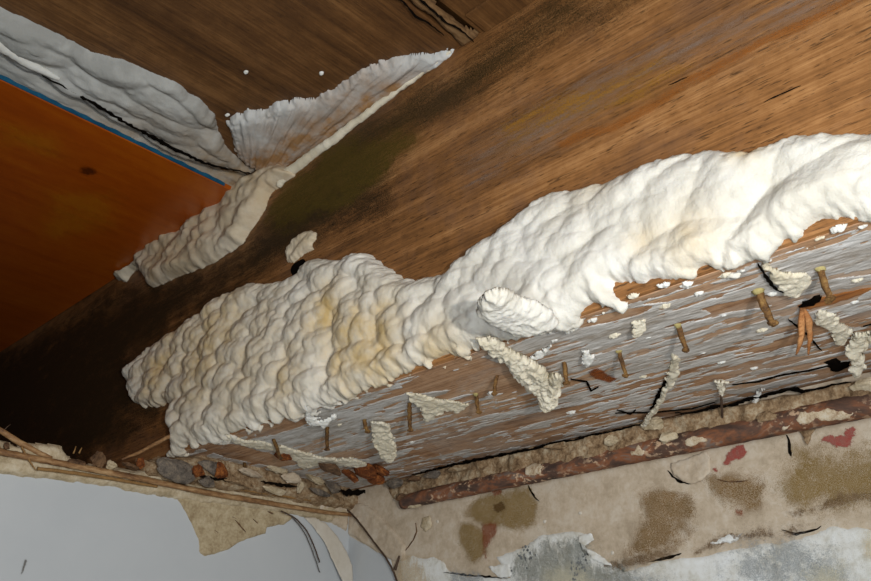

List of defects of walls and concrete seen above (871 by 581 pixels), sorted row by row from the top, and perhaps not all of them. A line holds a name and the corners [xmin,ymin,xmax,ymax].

rust [589,368,617,383]
crack [412,319,850,475]
spalling [0,435,406,581]
water stain [449,432,871,581]